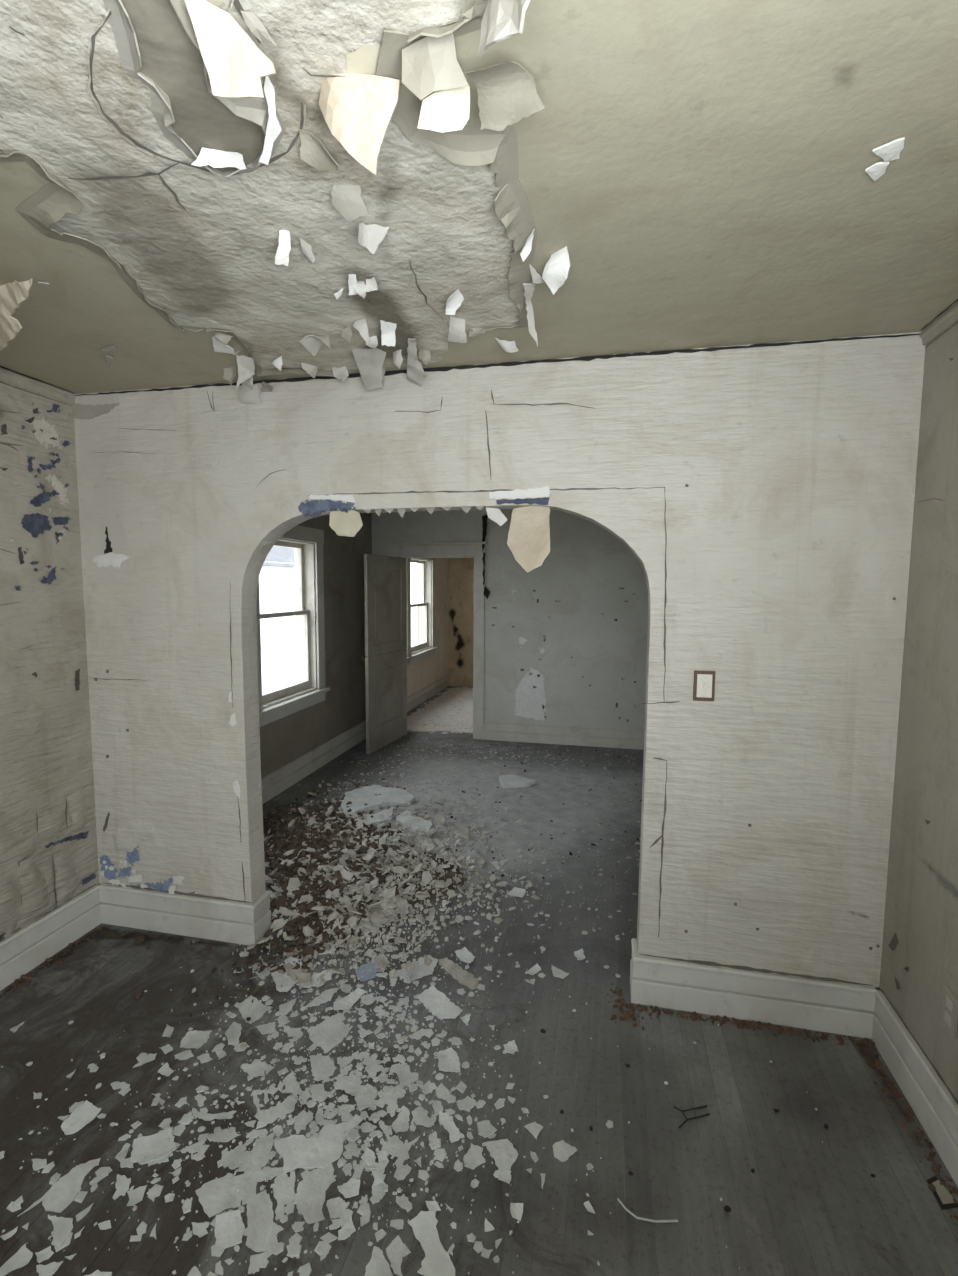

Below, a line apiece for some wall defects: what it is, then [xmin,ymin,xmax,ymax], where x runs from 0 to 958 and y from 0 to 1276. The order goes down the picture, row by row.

peeling [865,137,905,181]
peeling [0,0,570,404]
peeling [1,403,119,584]
peeling [298,494,435,537]
peeling [461,486,550,609]
peeling [75,669,109,691]
peeling [512,626,546,722]
peeling [44,812,110,848]
peeling [82,846,195,896]